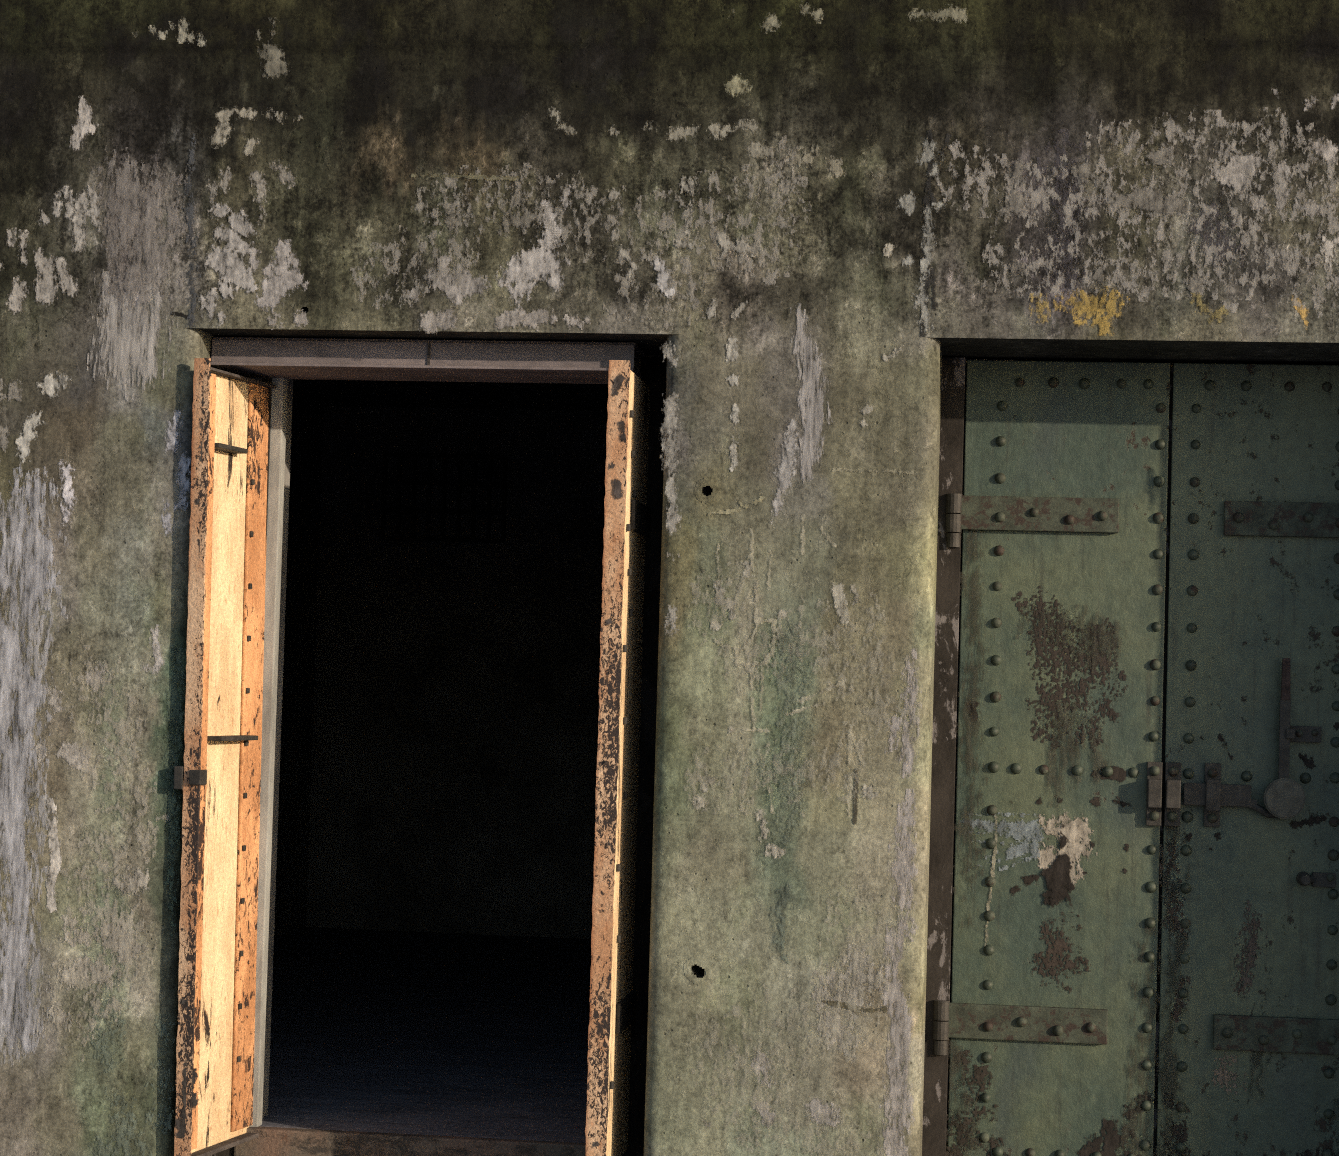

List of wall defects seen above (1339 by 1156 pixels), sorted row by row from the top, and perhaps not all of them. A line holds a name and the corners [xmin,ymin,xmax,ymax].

peeling [0,183,101,315]
peeling [70,95,99,150]
peeling [171,160,308,330]
peeling [211,107,303,149]
peeling [549,107,577,136]
peeling [936,89,1339,318]
damp [0,462,75,1064]
rust [1012,586,1128,807]
rust [1010,823,1091,994]
peeling [1037,812,1097,887]
rust [1077,826,1210,1156]
rust [946,1050,1010,1156]